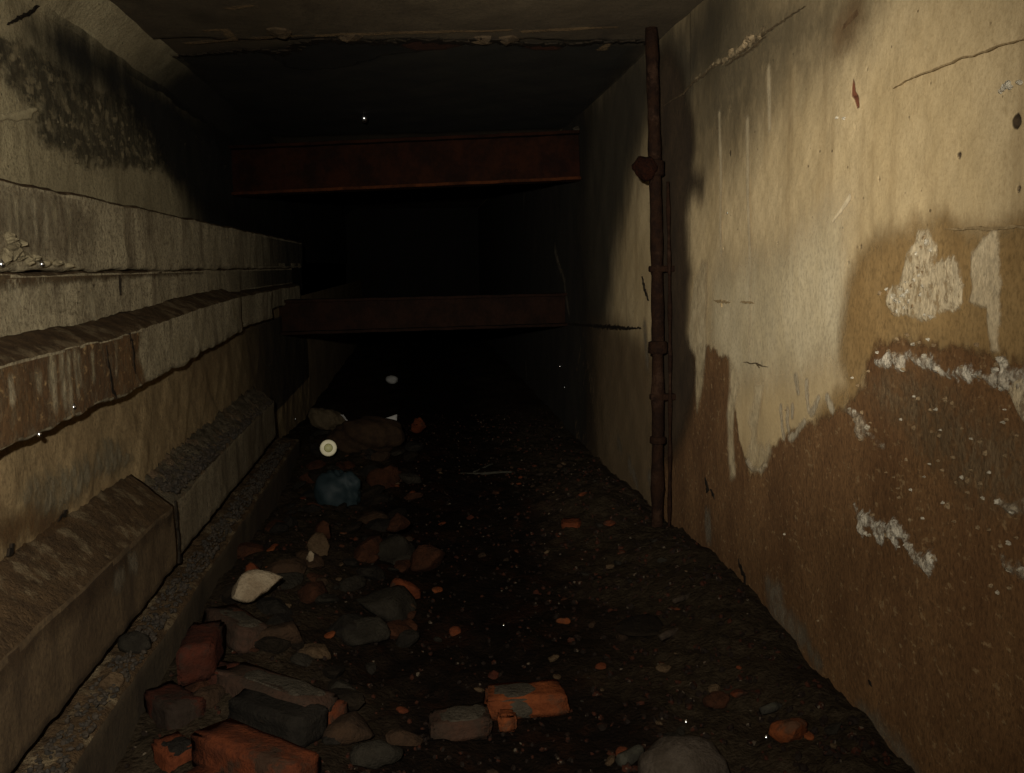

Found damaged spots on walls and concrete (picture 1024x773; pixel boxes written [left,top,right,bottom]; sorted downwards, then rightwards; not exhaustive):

crack [664,6,805,106]
crack [892,38,1024,89]
peeling [877,230,1001,351]
damp [575,53,1024,773]
spalling [881,379,1024,500]